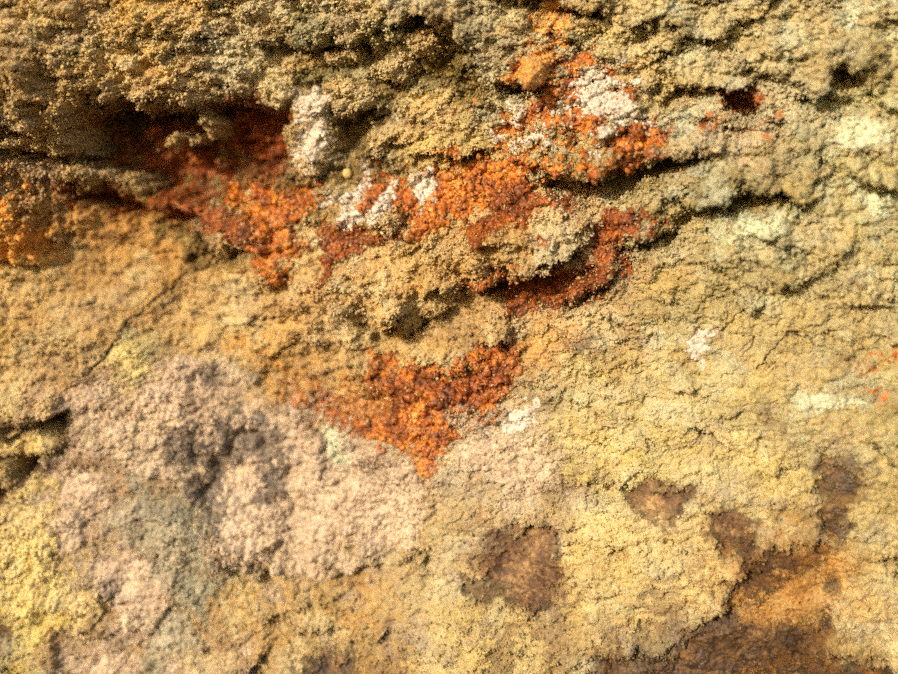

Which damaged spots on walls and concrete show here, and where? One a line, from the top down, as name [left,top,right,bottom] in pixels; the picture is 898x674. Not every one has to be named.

corrosion [0,0,675,500]
leakage [269,28,658,232]
leakage [0,338,445,674]